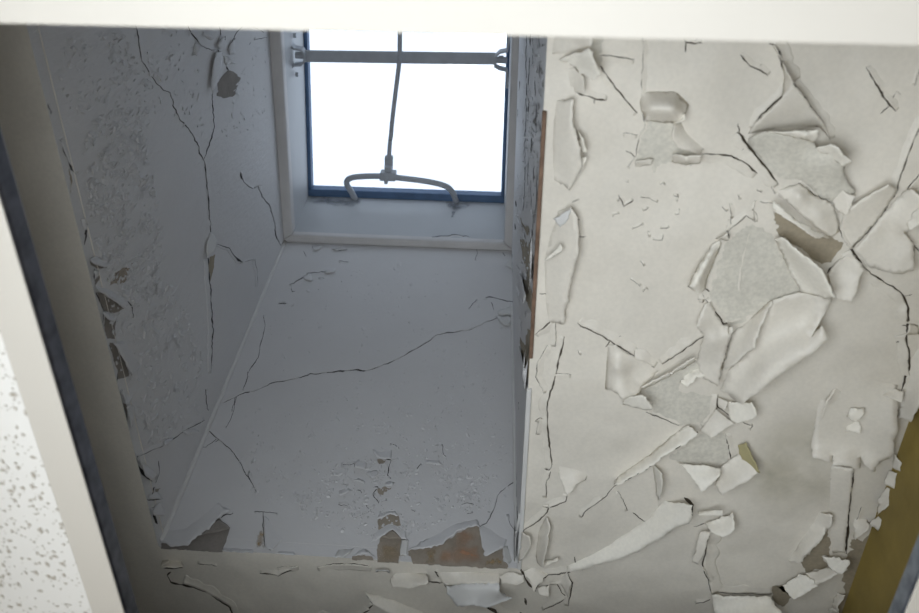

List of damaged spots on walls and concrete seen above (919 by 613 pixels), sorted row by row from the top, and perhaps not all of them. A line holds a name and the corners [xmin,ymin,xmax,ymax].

peeling [193,31,241,98]
crack [136,27,267,287]
crack [240,172,282,245]
peeling [90,256,141,428]
peeling [203,232,217,373]
crack [202,315,497,492]
peeling [334,37,919,613]
crack [167,561,239,613]
crack [487,557,584,613]